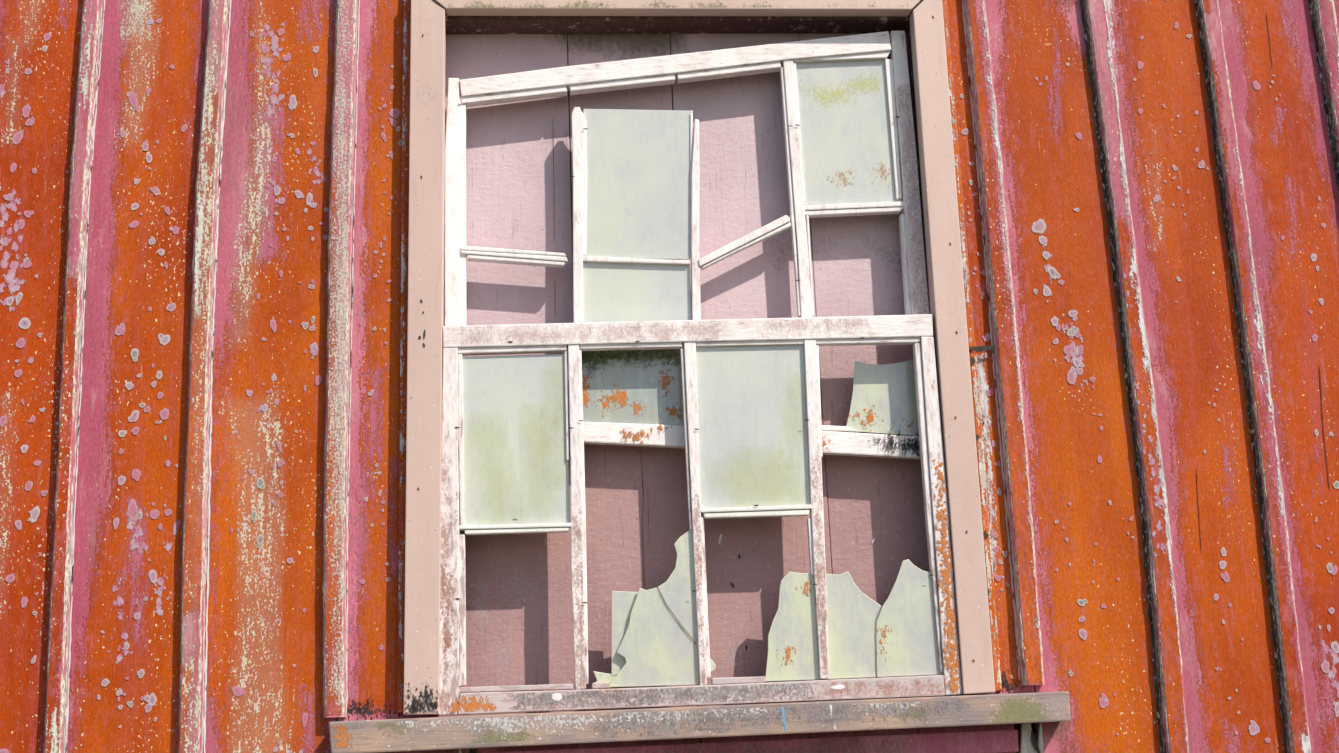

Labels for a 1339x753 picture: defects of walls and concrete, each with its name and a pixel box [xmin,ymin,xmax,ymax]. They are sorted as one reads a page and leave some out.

peeling [0,0,411,753]
damp [868,425,920,457]
peeling [943,0,1339,753]
peeling [440,492,458,706]
peeling [572,518,585,671]
rust [333,723,359,748]
peeling [818,656,940,699]